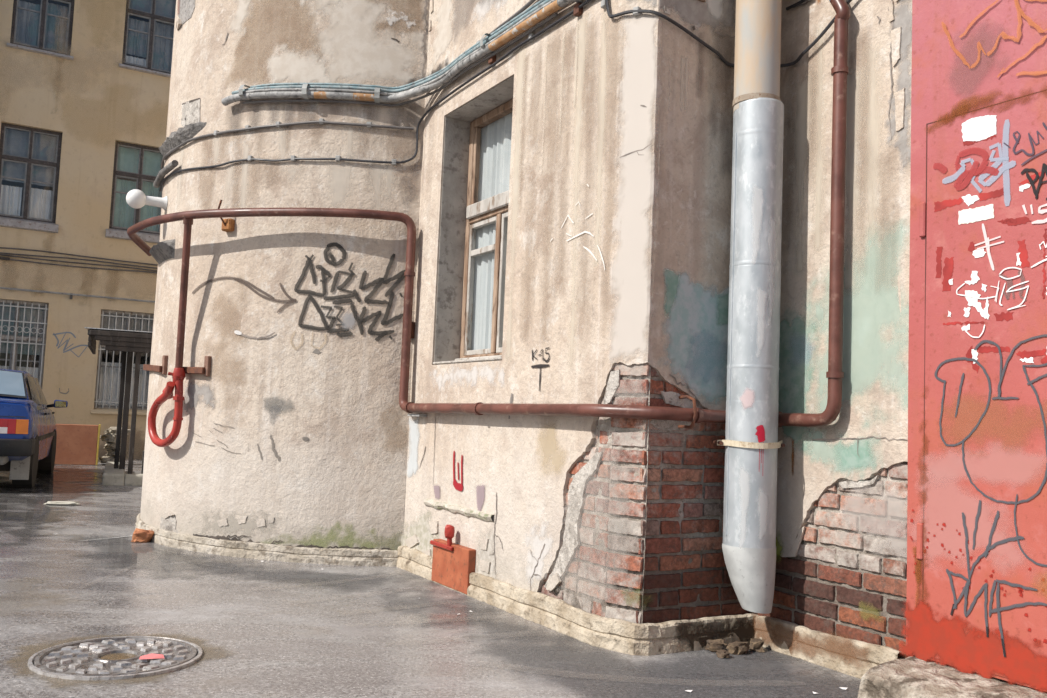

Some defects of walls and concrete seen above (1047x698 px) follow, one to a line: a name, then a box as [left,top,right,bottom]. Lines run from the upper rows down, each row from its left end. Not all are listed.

peeling [231,0,250,33]
peeling [268,0,453,85]
peeling [886,0,912,166]
spalling [601,363,705,409]
spalling [527,417,1047,692]